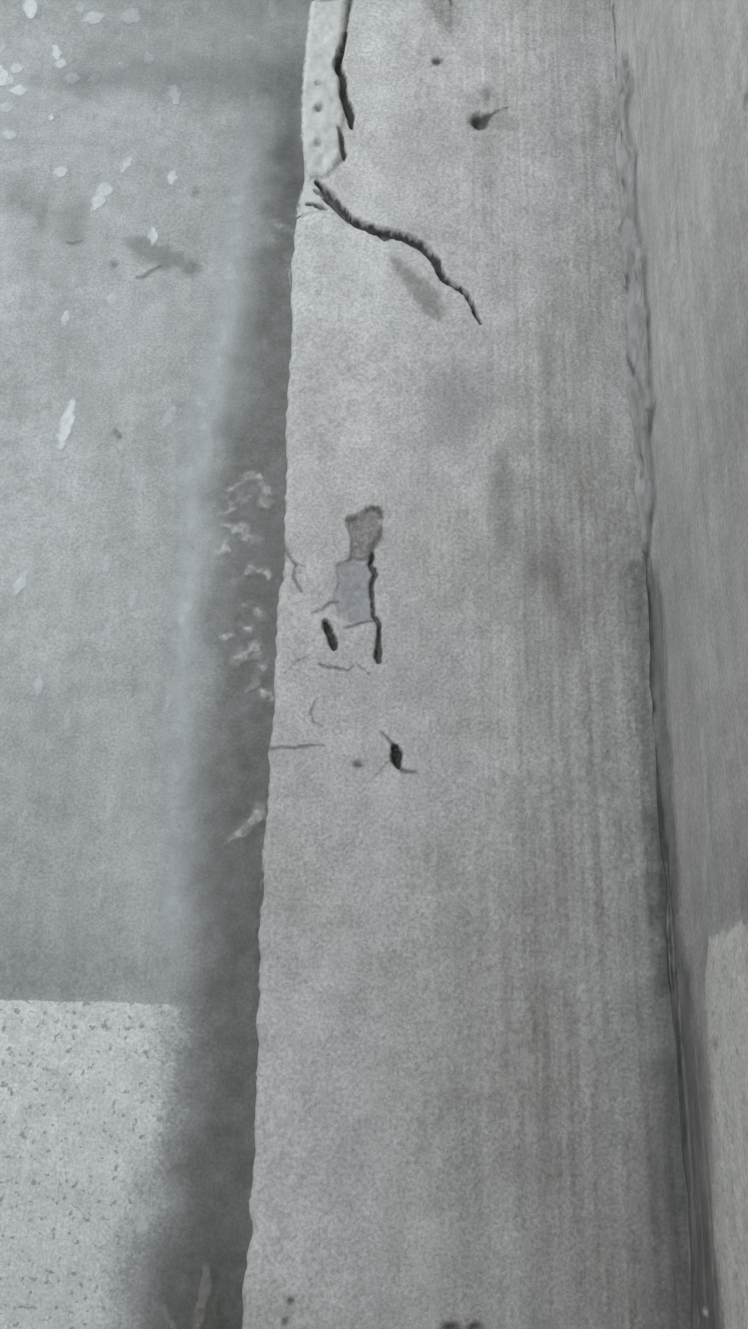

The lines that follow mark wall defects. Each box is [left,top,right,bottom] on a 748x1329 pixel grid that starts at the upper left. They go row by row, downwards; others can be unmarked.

crack [335,0,355,161]
crack [297,181,480,325]
leakage [214,462,281,556]
peeling [314,506,383,664]
leakage [222,531,284,904]